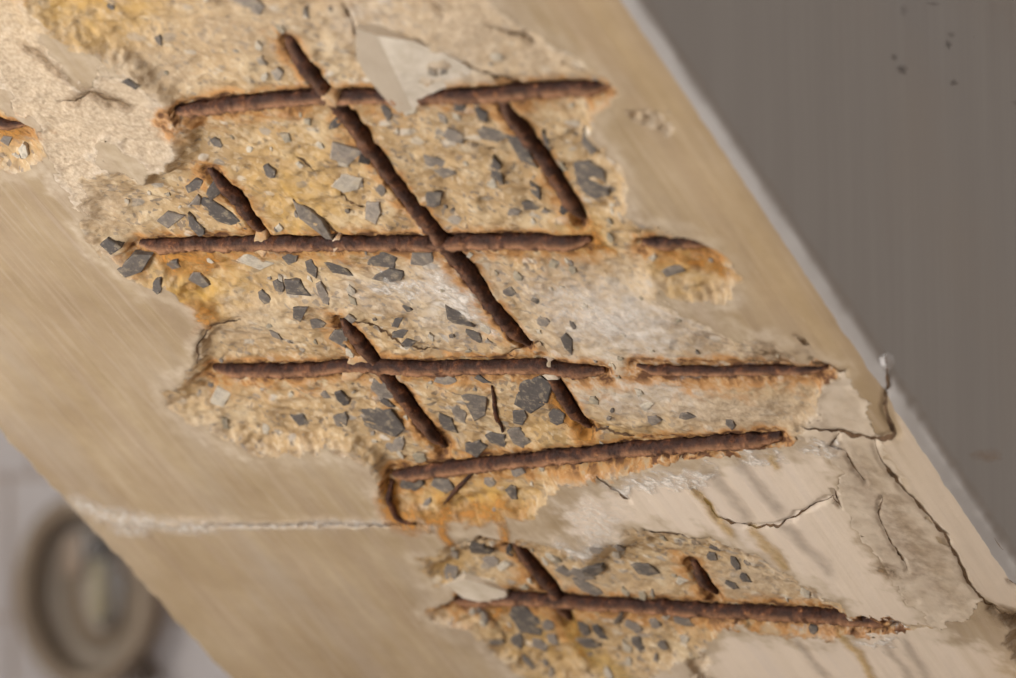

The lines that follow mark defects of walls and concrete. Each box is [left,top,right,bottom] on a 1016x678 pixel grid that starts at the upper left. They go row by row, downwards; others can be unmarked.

corrosion [159,252,236,274]
spalling [0,0,881,526]
corrosion [551,393,593,442]
crack [212,520,424,528]
crack [695,487,841,529]
crack [801,356,1016,614]
spalling [414,429,986,678]